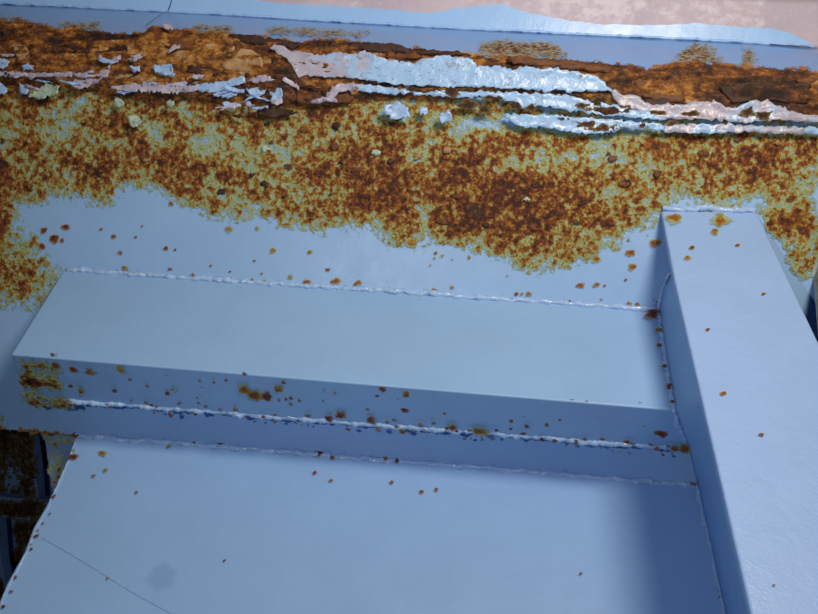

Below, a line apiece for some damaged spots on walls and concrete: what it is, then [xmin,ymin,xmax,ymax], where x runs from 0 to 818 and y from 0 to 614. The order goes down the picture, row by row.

peeling [0,53,299,110]
peeling [310,82,358,104]
peeling [127,115,142,128]
peeling [383,101,453,124]
rust [0,16,818,318]
rust [627,299,663,332]
rust [17,353,96,410]
rust [237,372,302,406]
rust [366,408,435,434]
rust [444,424,498,440]
rust [649,431,691,456]